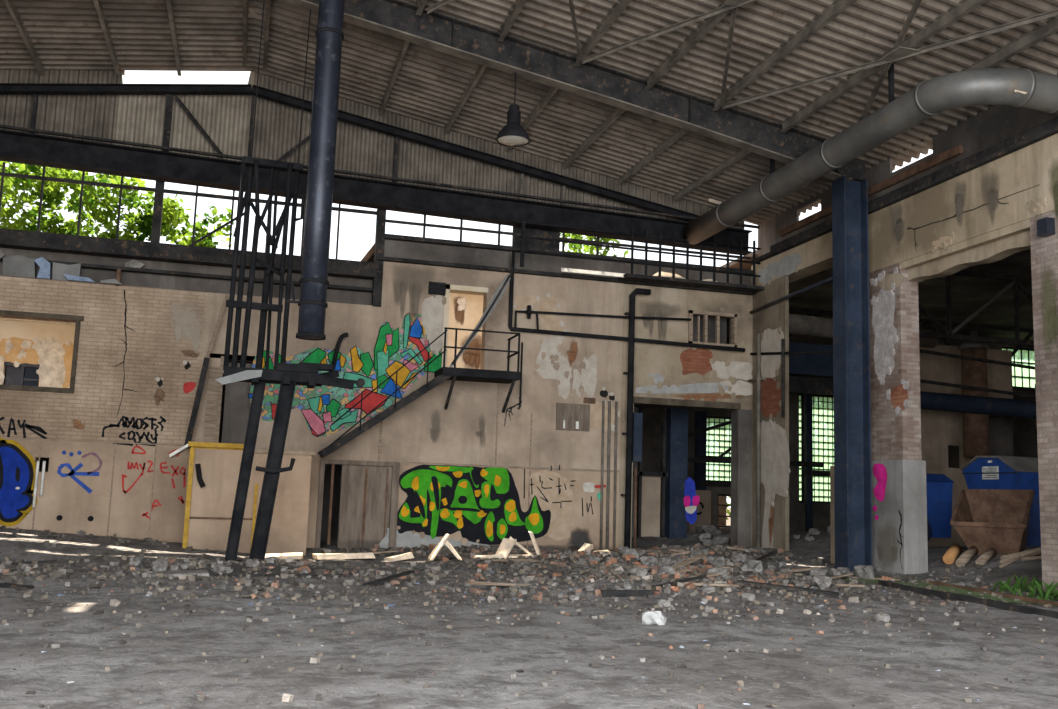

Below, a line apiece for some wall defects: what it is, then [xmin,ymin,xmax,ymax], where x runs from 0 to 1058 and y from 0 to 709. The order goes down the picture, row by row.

peeling [0,333,74,388]
crack [114,290,137,418]
peeling [513,292,620,431]
peeling [870,267,909,415]
flaking render [633,327,791,548]